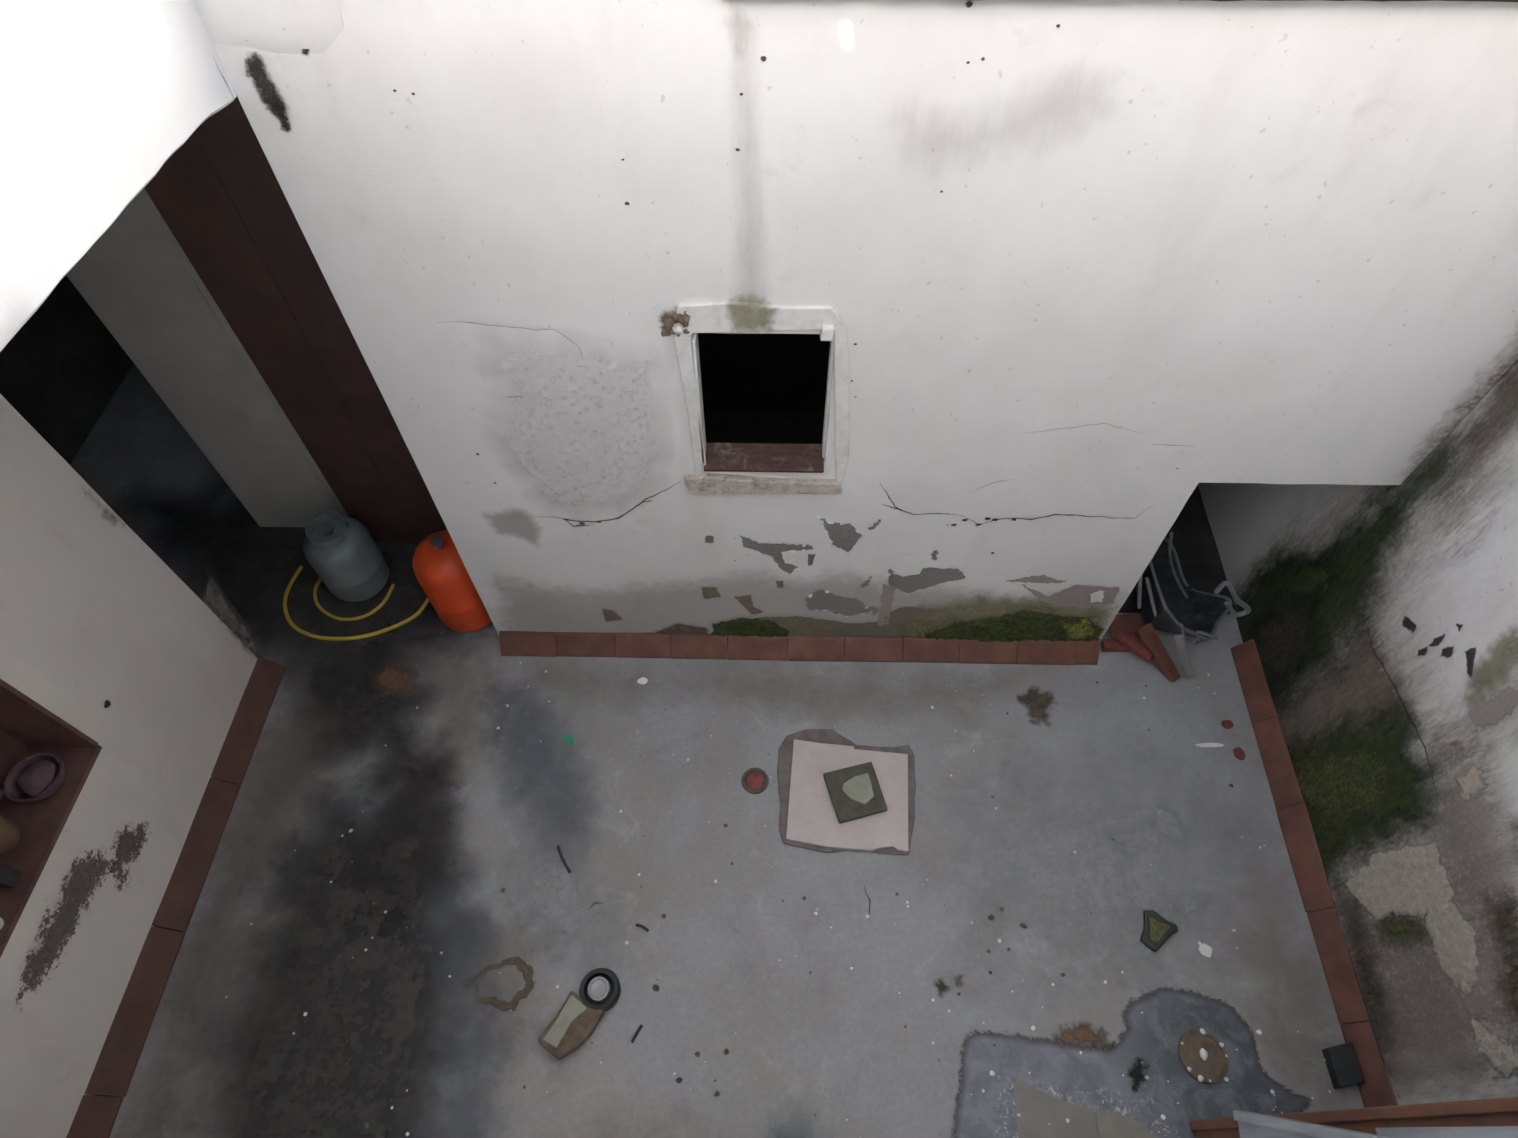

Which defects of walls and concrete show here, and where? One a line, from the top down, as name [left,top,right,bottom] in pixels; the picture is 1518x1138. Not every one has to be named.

damp [1416,347,1518,469]
crack [556,481,681,527]
crack [880,484,1153,526]
peeling [817,515,881,553]
peeling [734,536,816,588]
peeling [603,609,622,622]
peeling [702,587,763,614]
peeling [805,550,965,626]
damp [130,490,493,1138]